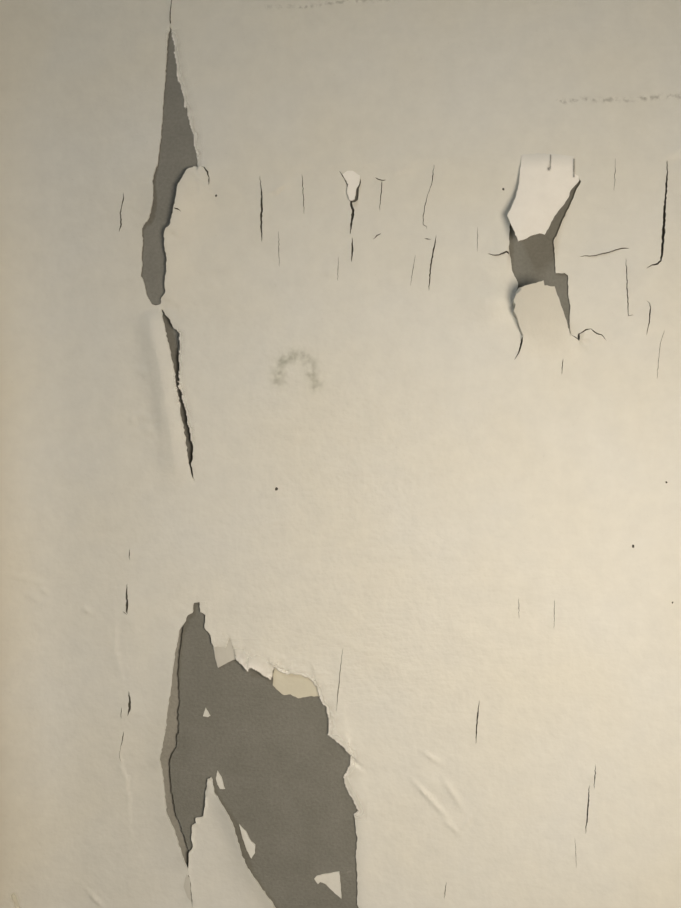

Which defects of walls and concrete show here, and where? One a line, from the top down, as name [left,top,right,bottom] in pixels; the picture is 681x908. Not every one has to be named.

peeling [131,0,213,494]
peeling [335,168,368,268]
peeling [484,151,613,377]
crack [574,154,675,385]
peeling [150,591,370,908]